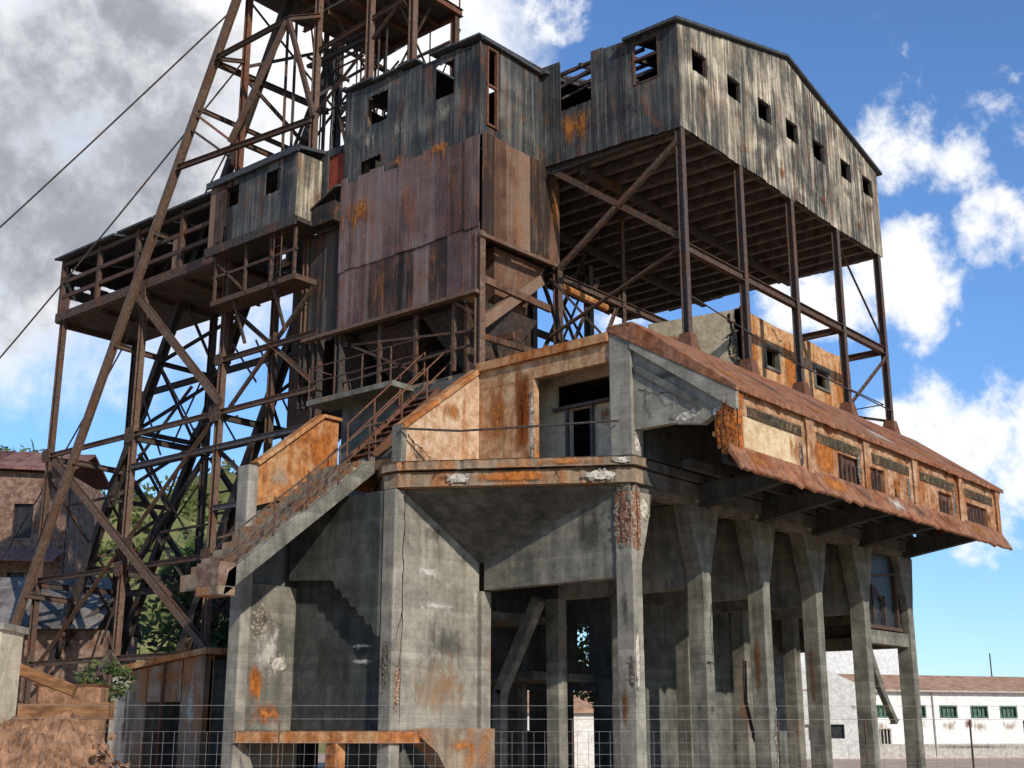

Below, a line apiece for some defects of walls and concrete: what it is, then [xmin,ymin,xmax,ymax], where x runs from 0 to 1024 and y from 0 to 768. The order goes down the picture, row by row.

rust [491,374,529,448]
spalling [712,398,742,454]
spalling [446,473,470,484]
spalling [582,432,650,550]
flaking render [250,602,276,647]
crack [395,496,406,718]
flaking render [270,653,286,674]
rust [250,666,278,721]